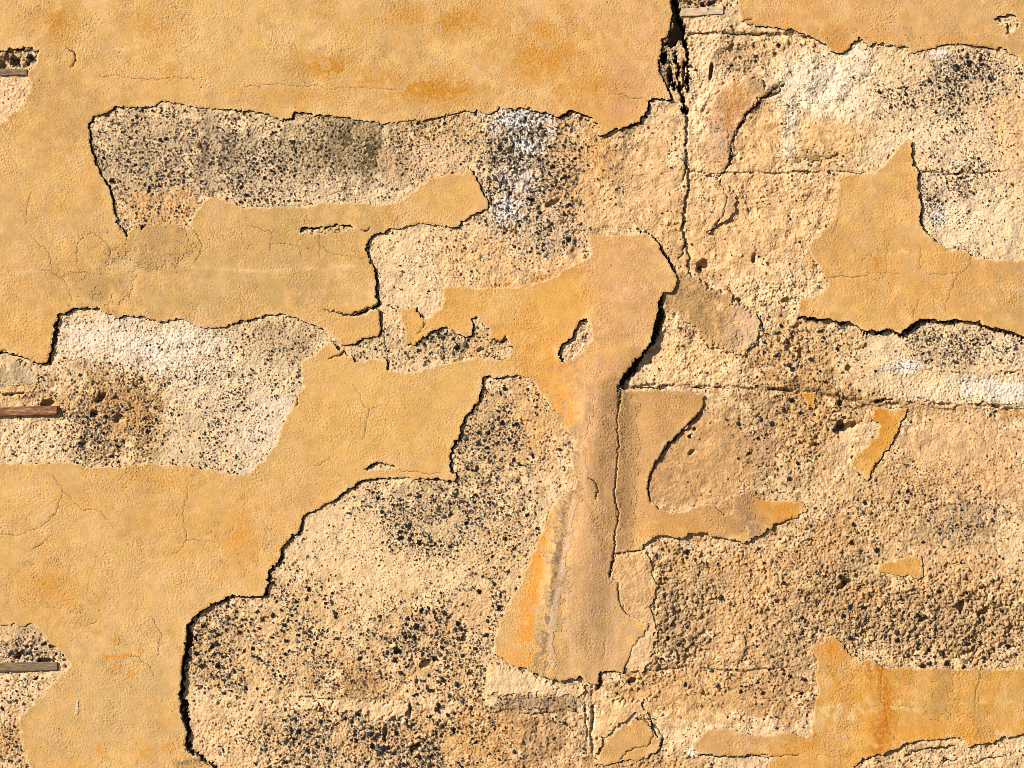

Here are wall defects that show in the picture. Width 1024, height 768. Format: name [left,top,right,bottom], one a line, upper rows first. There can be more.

spalling [0,623,70,768]
spalling [0,101,626,475]
spalling [179,374,650,768]
spalling [576,0,1024,768]